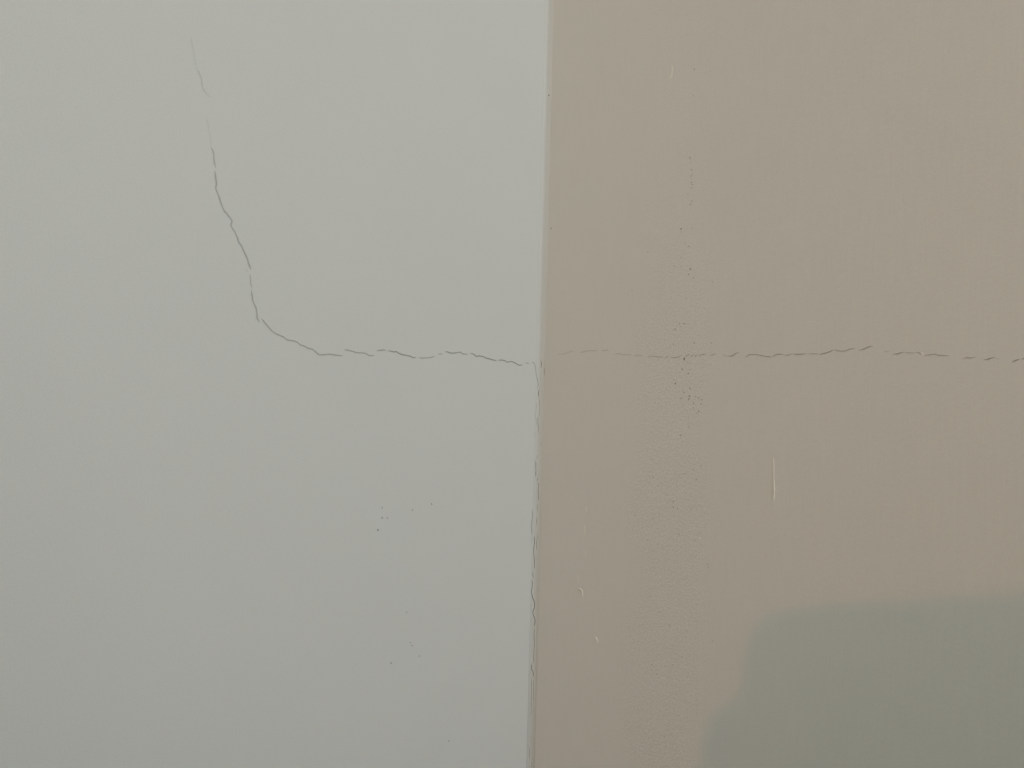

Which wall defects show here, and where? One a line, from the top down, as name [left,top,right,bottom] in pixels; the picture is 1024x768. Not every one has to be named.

crack [189,37,1024,717]